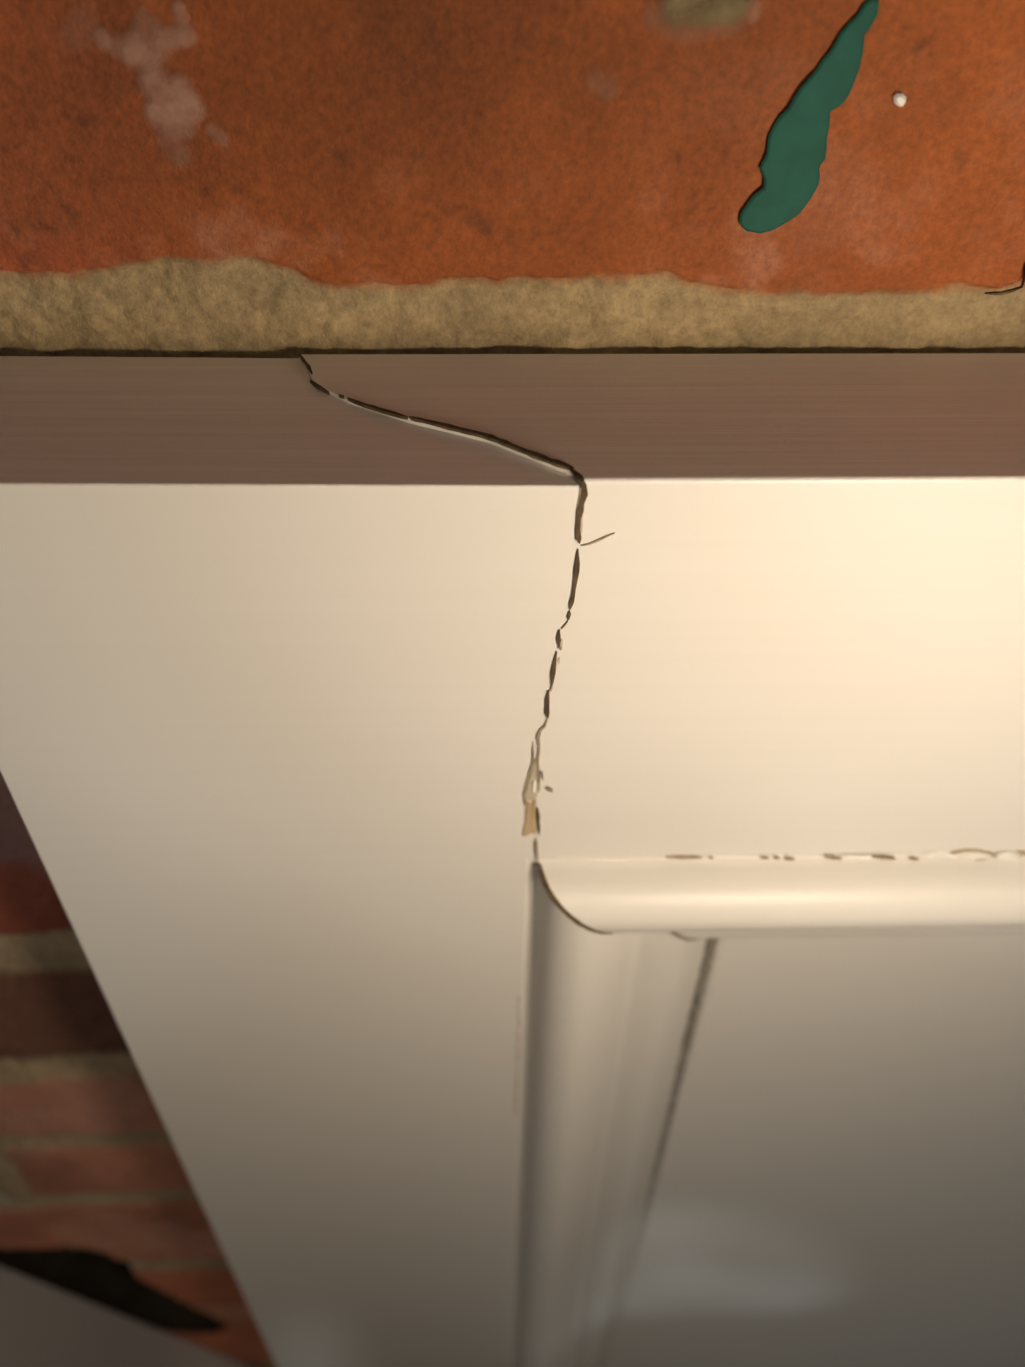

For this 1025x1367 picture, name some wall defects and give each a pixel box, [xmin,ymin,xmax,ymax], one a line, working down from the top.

leakage [96,25,201,138]
crack [984,268,1025,295]
crack [299,352,615,934]
peeling [824,848,1025,861]
spalling [0,1246,228,1332]